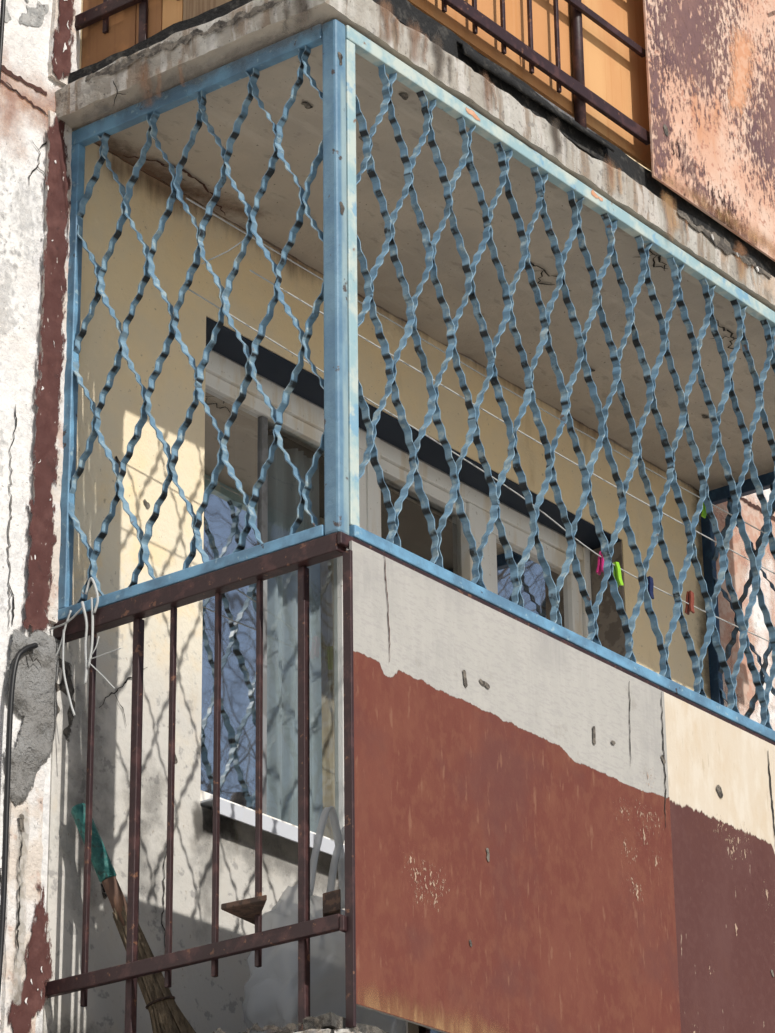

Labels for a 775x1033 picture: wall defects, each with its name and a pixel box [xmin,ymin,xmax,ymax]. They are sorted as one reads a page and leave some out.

peeling [5,0,76,80]
spalling [85,0,283,82]
rust [727,25,755,117]
rust [665,197,687,232]
crack [7,406,17,630]
spalling [194,806,235,836]
peeling [8,811,53,1033]
peeling [404,856,444,910]
rust [385,1004,470,1033]